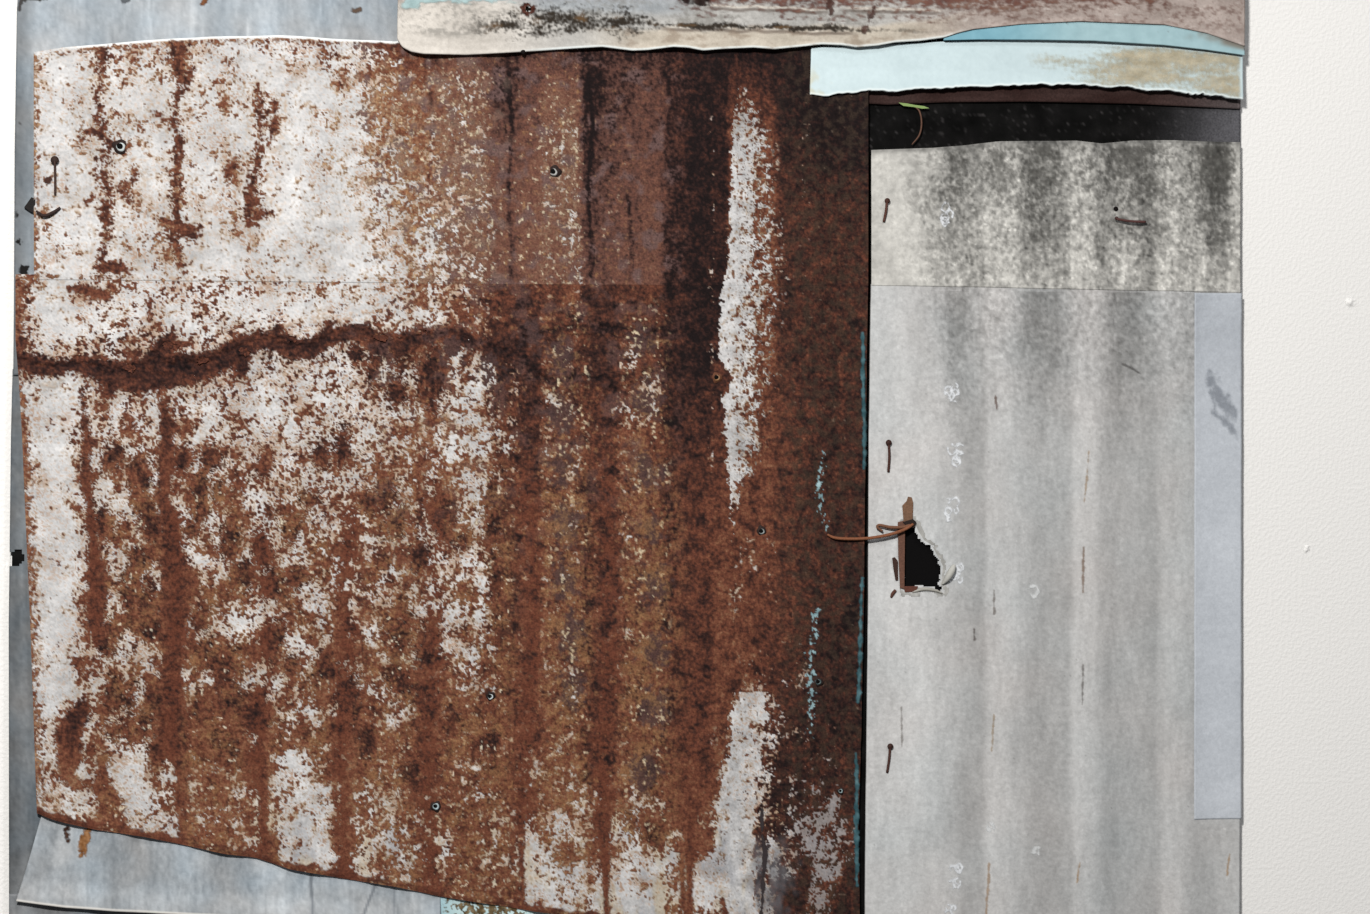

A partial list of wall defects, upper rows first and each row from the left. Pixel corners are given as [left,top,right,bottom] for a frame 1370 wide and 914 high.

corrosion [520,3,536,16]
corrosion [679,0,1058,34]
corrosion [15,40,868,914]
spalling [900,516,956,597]